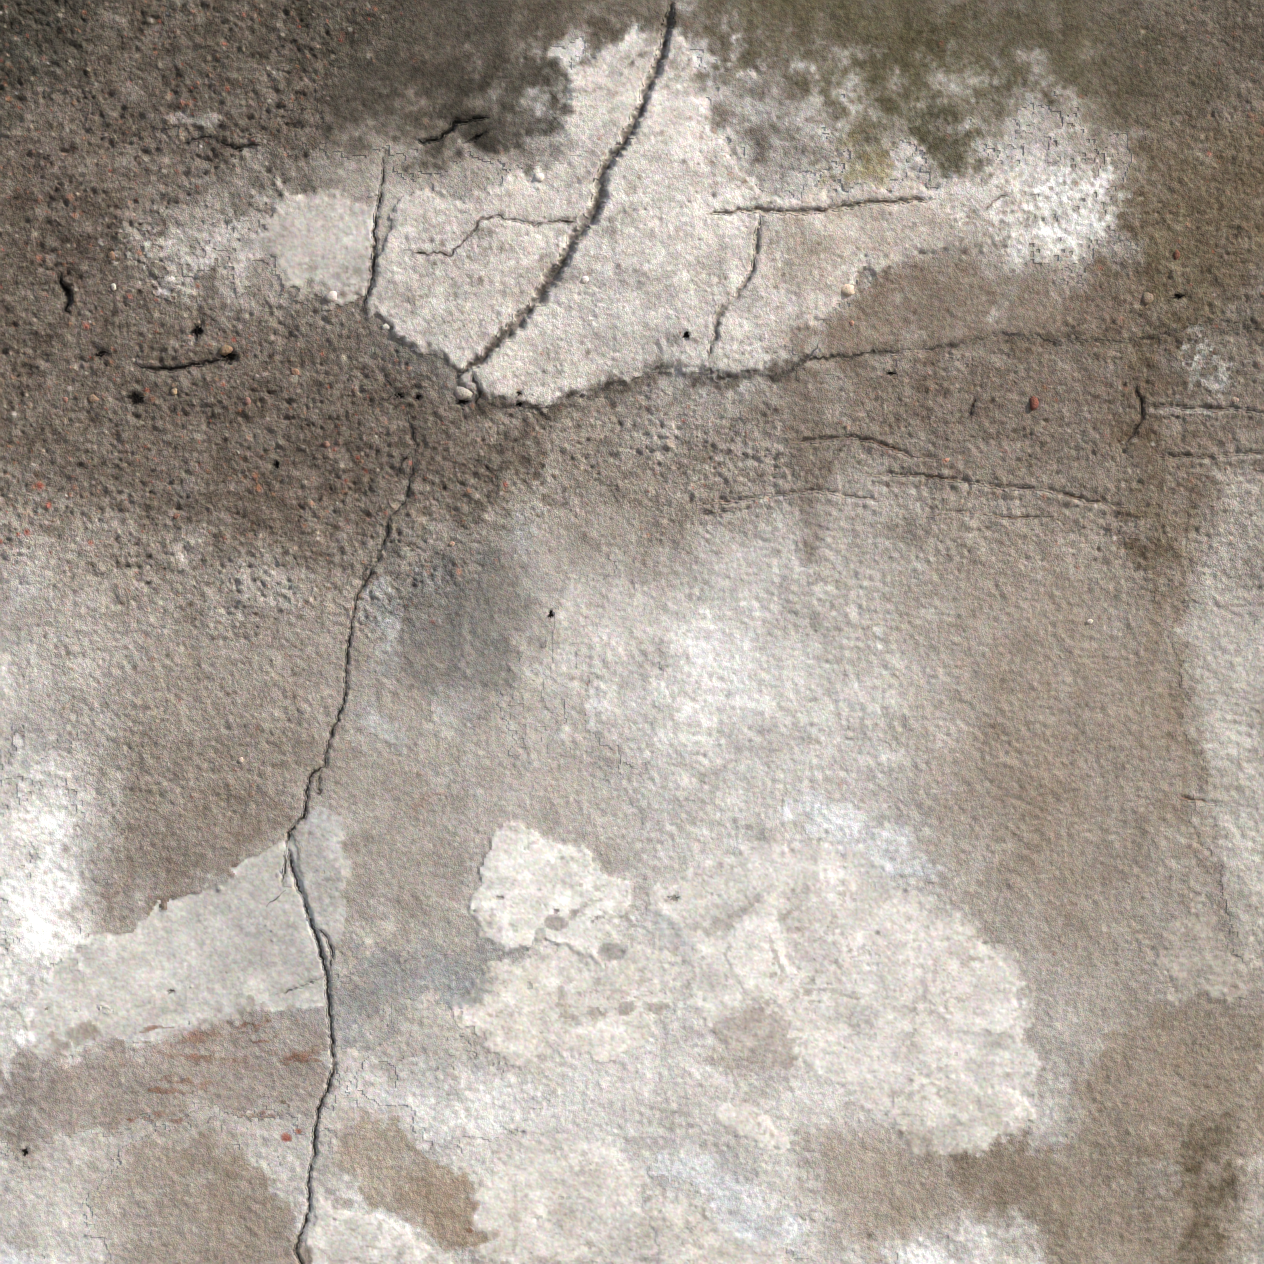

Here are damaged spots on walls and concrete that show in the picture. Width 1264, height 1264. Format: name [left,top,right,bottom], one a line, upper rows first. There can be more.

peeling [161,110,223,130]
spalling [187,323,206,341]
spalling [218,348,239,365]
leakage [778,87,1264,417]
leakage [0,80,783,1136]
crack [266,3,1264,1264]
leakage [766,481,1264,989]
leakage [0,1226,53,1264]
leakage [83,1111,316,1264]
leakage [316,1037,552,1264]
flaking render [452,821,1056,1156]
leakage [648,981,1264,1264]